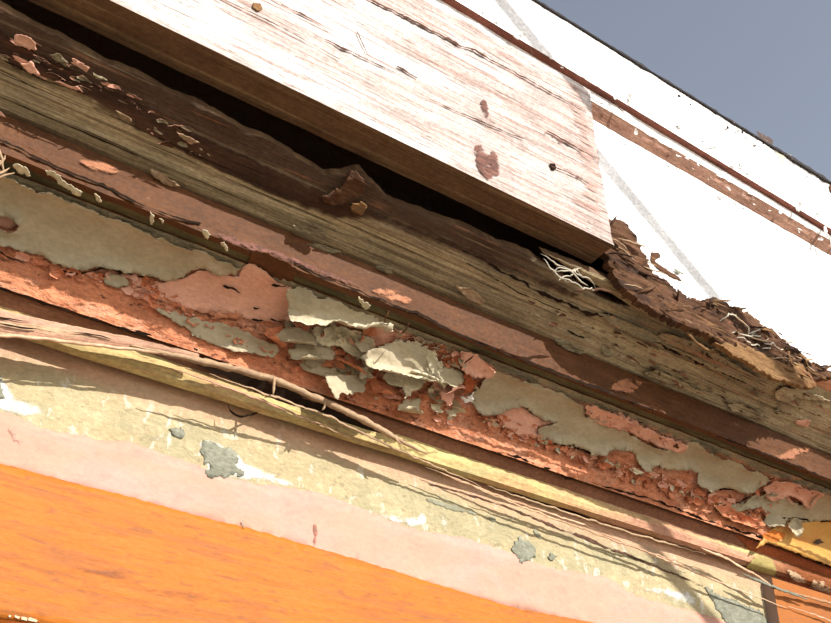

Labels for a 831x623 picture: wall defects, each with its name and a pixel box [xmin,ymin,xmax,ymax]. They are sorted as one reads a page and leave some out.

peeling [690,103,791,162]
crack [63,267,148,278]
crack [0,285,173,341]
peeling [0,164,831,529]
peeling [511,529,541,564]
peeling [705,586,768,623]